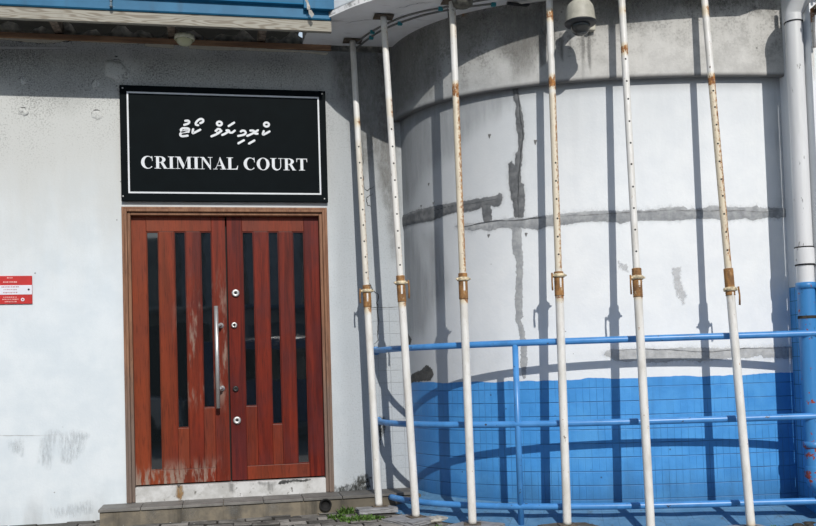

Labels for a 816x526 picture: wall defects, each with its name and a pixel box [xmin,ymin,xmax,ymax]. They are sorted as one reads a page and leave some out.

crack [369,283,392,347]
peeling [411,365,434,383]